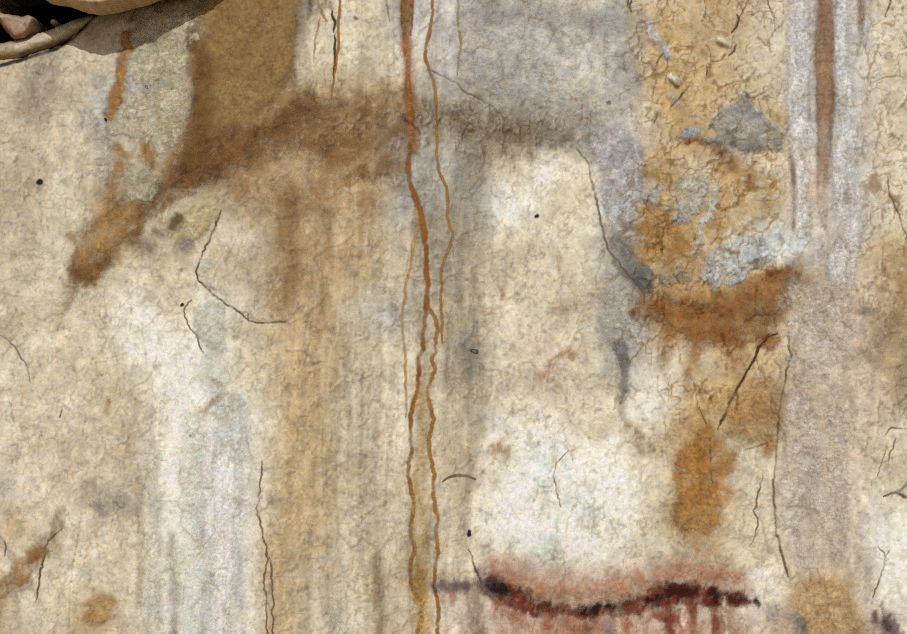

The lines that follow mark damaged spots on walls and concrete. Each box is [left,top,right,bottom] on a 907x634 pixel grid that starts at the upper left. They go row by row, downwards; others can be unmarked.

damp [96,0,313,187]
crack [728,0,770,56]
damp [124,162,158,201]
crack [183,209,286,357]
rust [66,0,453,634]
crack [576,148,645,303]
rust [633,137,781,264]
rust [632,264,802,375]
rust [673,384,780,556]
crack [877,426,907,498]
crack [257,462,275,634]